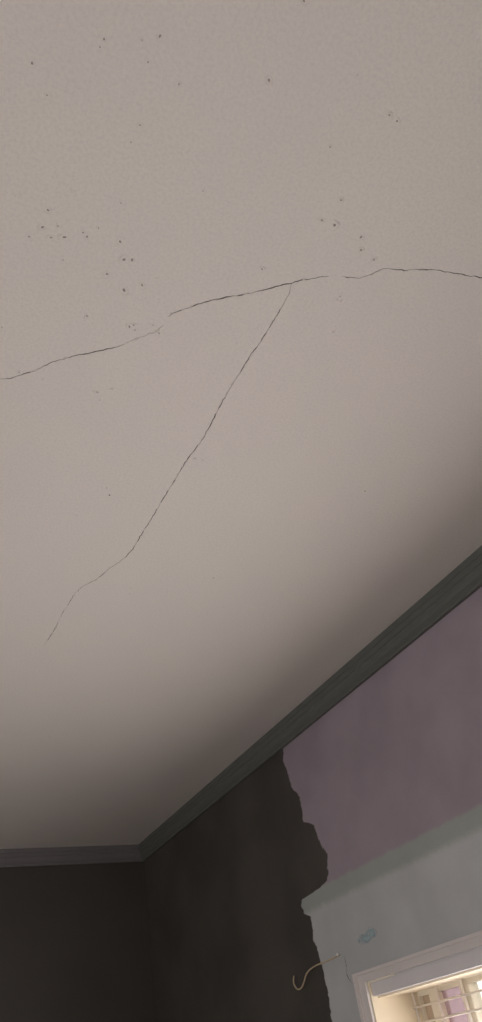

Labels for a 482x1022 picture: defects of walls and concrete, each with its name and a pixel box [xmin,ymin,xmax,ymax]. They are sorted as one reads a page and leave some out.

crack [6,268,482,645]